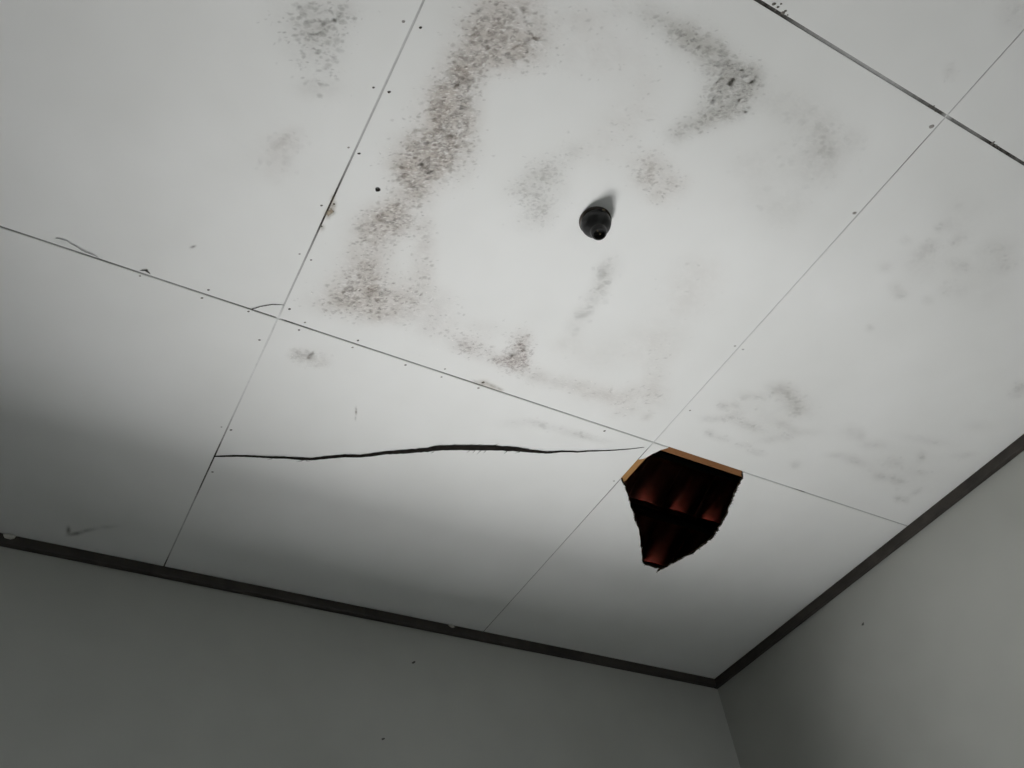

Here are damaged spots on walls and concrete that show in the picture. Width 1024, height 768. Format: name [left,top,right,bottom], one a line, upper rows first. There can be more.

damp [312,1,569,383]
crack [214,444,644,462]
spalling [621,472,743,572]